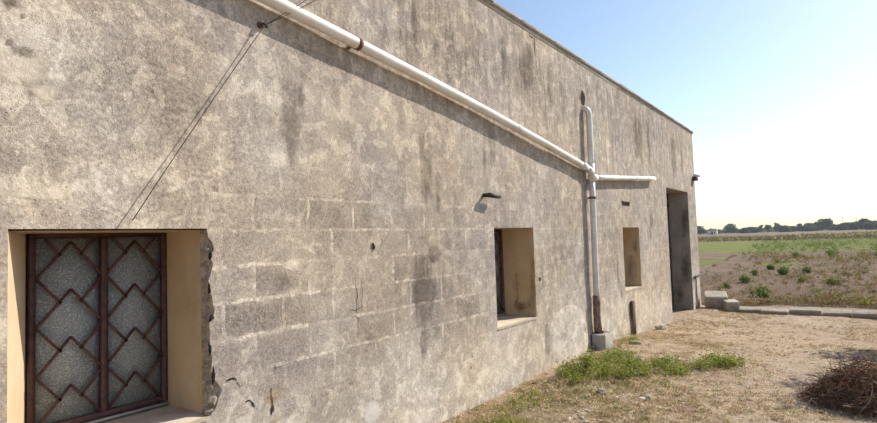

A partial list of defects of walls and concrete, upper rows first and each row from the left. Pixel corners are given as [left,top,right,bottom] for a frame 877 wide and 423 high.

spalling [200,229,222,416]